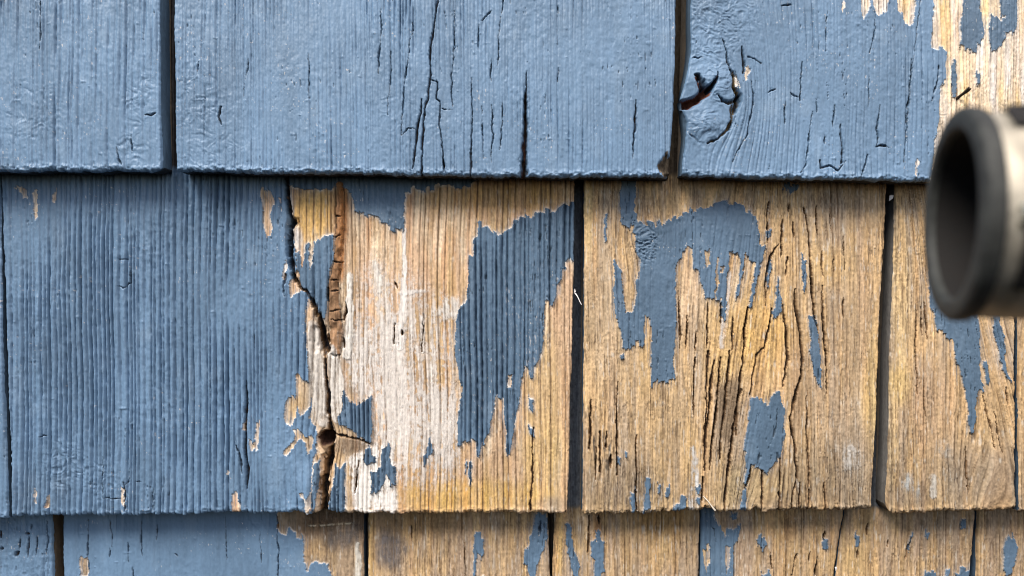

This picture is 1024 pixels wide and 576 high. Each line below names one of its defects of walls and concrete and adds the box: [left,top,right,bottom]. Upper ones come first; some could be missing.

crack [377,0,528,179]
crack [693,18,939,176]
crack [282,176,370,510]
peeling [260,0,1024,576]
crack [678,203,846,575]